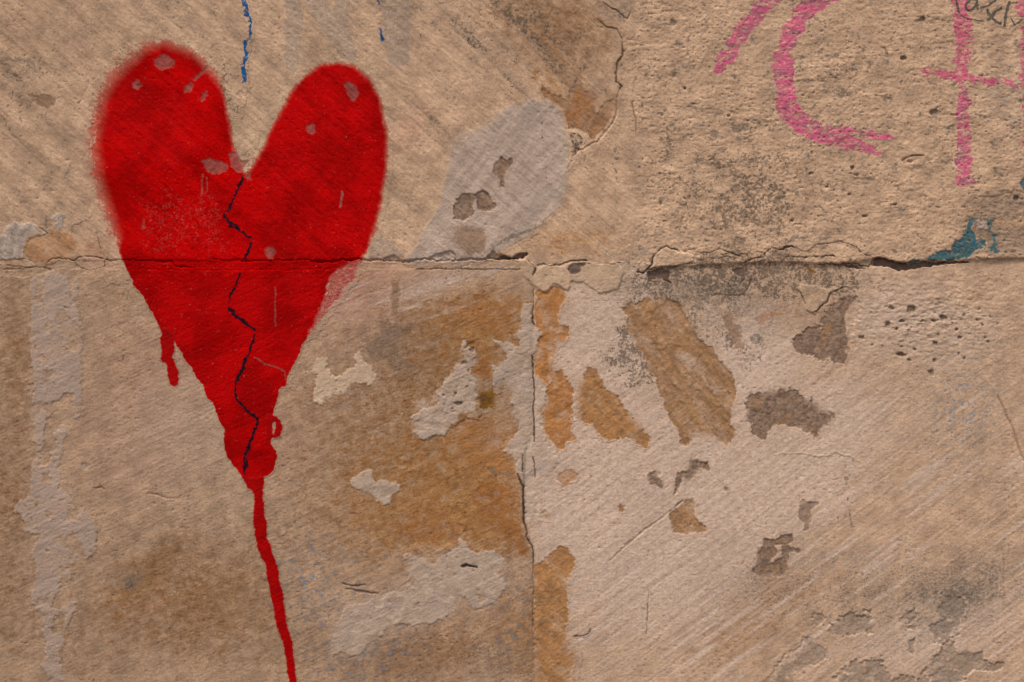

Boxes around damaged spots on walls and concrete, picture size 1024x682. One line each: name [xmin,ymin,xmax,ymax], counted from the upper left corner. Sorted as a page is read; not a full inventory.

crack [596,0,638,135]
crack [0,220,109,272]
spalling [441,384,470,412]
crack [369,258,622,326]
spalling [494,252,529,261]
peeling [531,261,651,454]
peeling [616,245,840,539]
peeling [791,284,861,371]
crack [516,355,537,625]
peeling [747,499,820,585]
spalling [341,582,380,596]
peeling [527,543,582,682]